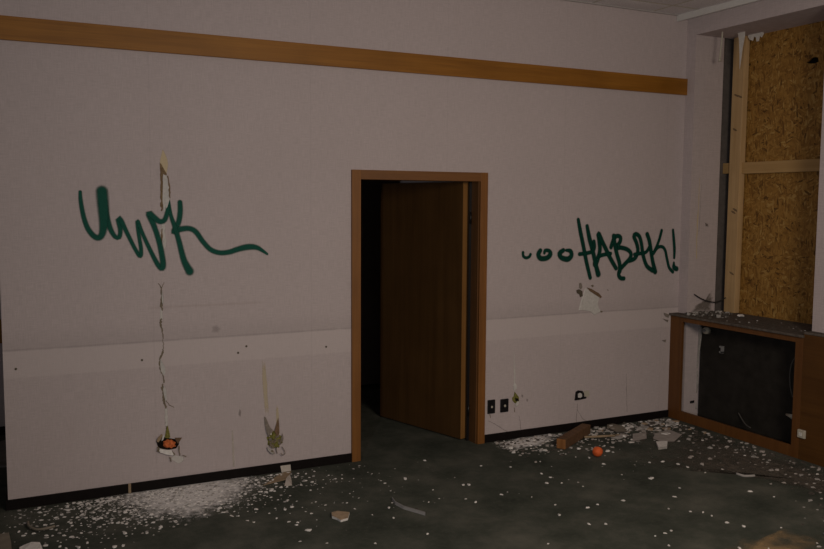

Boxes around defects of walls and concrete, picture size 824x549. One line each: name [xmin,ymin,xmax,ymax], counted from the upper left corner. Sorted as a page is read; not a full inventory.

flaking render [576,283,608,315]
crack [158,283,173,428]
spalling [156,426,186,463]
spalling [264,417,285,455]